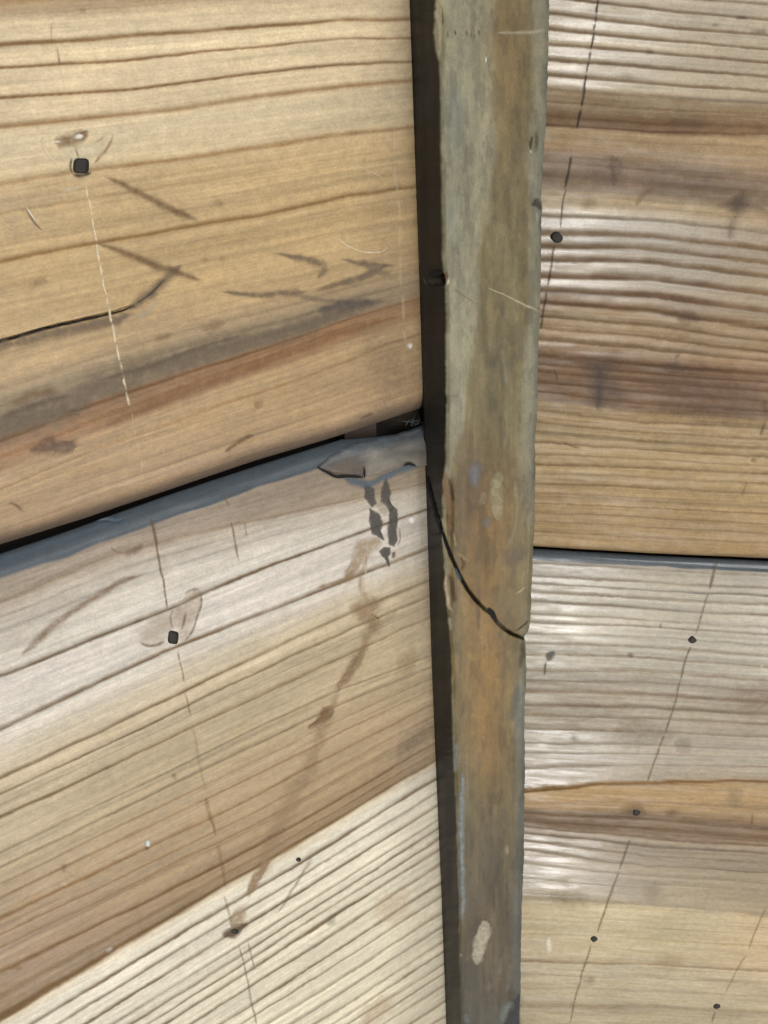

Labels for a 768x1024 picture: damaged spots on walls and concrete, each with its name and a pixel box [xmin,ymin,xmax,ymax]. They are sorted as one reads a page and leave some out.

crack [0,266,179,349]
crack [317,467,366,478]
crack [403,462,528,638]
damp [309,708,332,727]
damp [248,829,283,895]